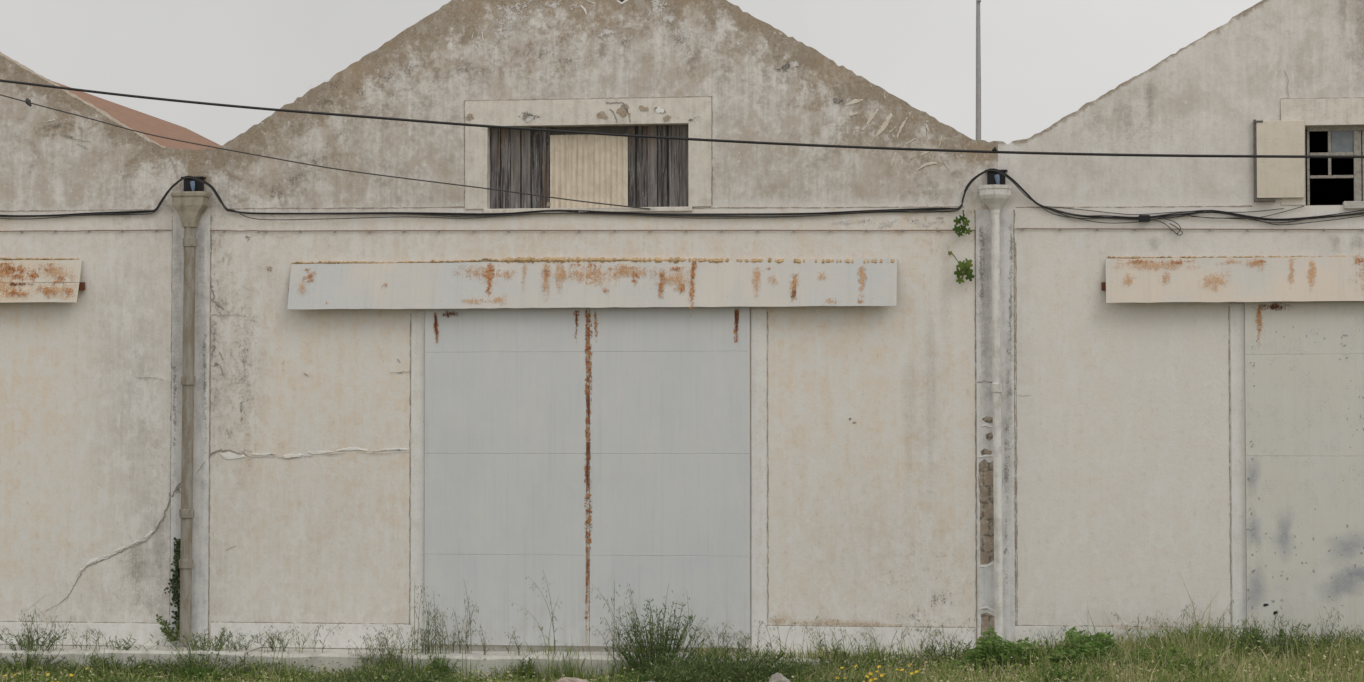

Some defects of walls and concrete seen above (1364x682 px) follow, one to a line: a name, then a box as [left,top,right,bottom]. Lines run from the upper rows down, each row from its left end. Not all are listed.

rust [0,262,73,299]
rust [433,262,697,342]
rust [1116,259,1196,283]
crack [25,448,409,616]
rust [574,310,598,635]
flaking render [978,416,994,568]
flaking render [980,606,995,645]